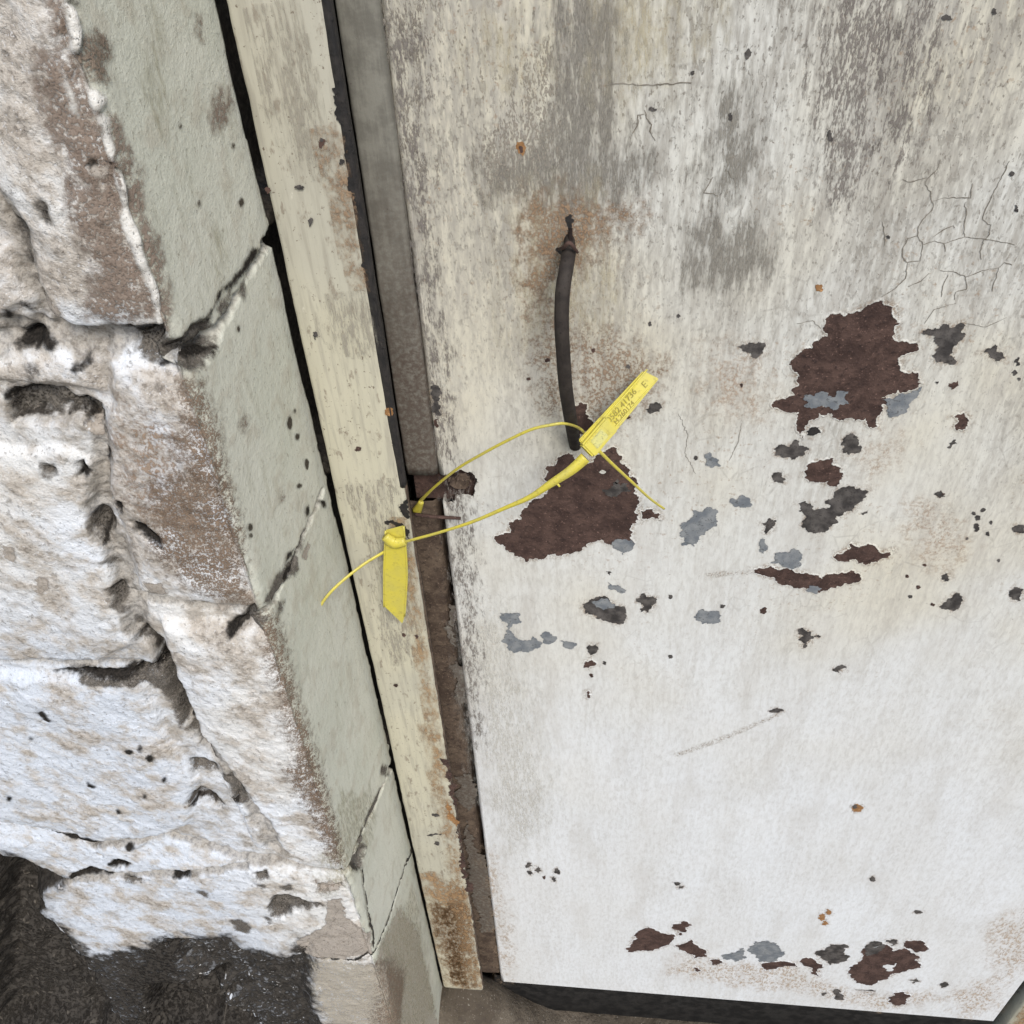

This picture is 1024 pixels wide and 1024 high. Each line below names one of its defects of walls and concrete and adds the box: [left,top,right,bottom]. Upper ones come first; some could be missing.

crack [202,231,268,322]
rust [311,128,368,286]
crack [882,159,1014,321]
peeling [769,298,966,533]
peeling [500,613,606,699]
rust [422,679,454,836]
rust [422,849,482,989]